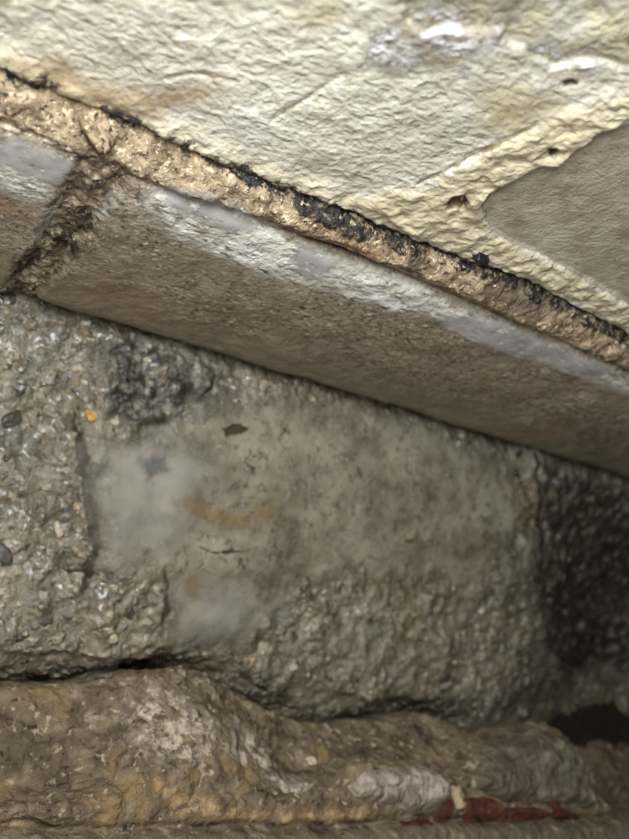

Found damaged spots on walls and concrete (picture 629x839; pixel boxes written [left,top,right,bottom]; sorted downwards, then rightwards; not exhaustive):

peeling [483,124,629,304]
crack [161,570,170,623]
crack [25,670,87,682]
crack [118,658,170,670]
spalling [116,686,282,786]